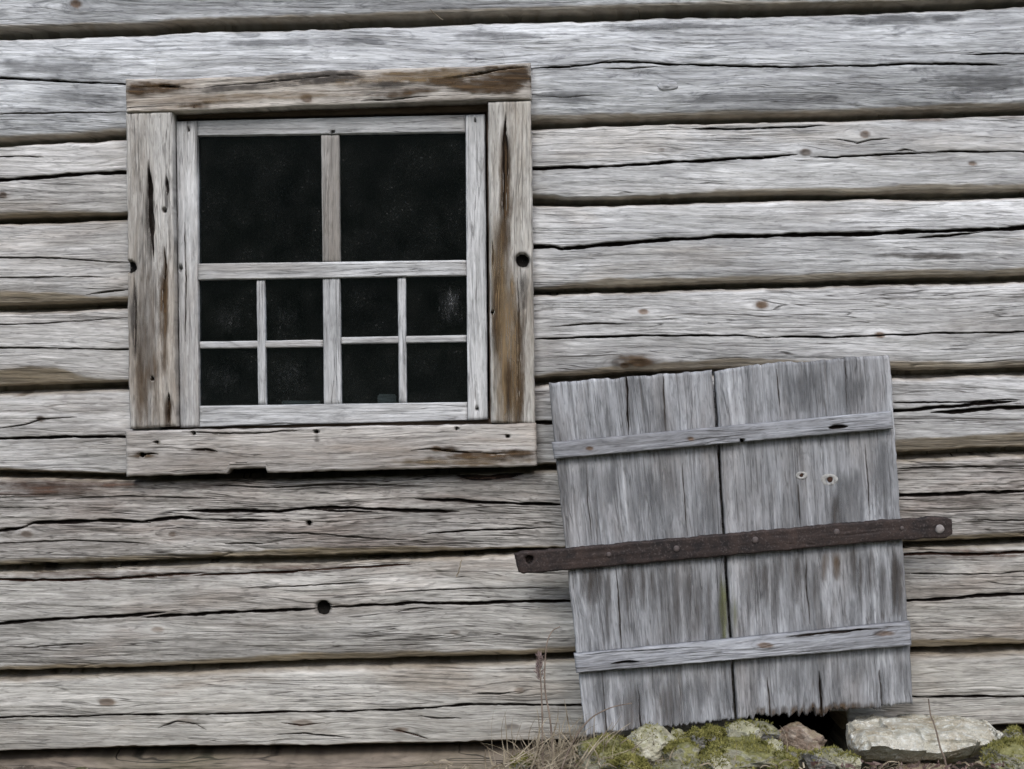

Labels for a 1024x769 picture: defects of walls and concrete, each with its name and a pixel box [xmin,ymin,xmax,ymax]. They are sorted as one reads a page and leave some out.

crack [492,116,1024,268]
crack [517,279,1024,340]
crack [893,399,1024,414]
crack [0,448,571,648]
crack [0,573,638,739]